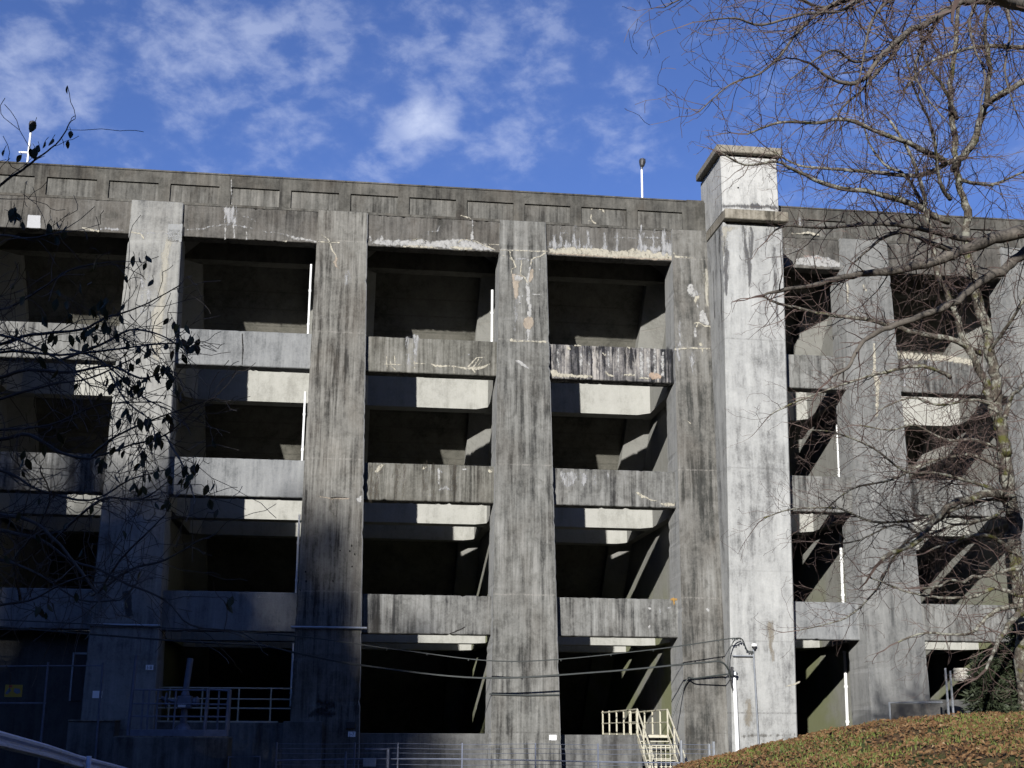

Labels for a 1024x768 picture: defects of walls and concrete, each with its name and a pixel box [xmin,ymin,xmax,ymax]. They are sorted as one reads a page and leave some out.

efflorescence [549,208,623,252]
spalling [549,247,672,260]
efflorescence [637,225,672,256]
water stain [705,226,778,326]
spalling [687,284,711,328]
water stain [557,321,681,378]